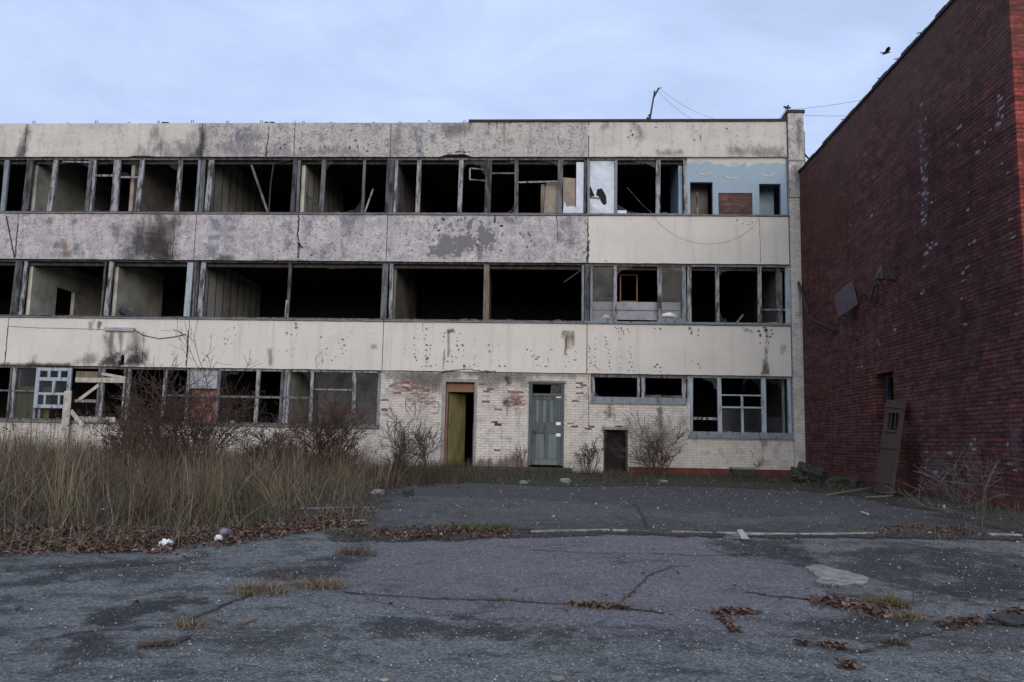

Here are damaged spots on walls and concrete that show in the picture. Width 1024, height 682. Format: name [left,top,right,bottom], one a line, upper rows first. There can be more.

water stain [127,216,176,260]
crack [295,214,303,258]
peeling [421,216,504,259]
water stain [83,335,143,365]
flaking render [381,378,437,411]
flaking render [478,383,525,426]